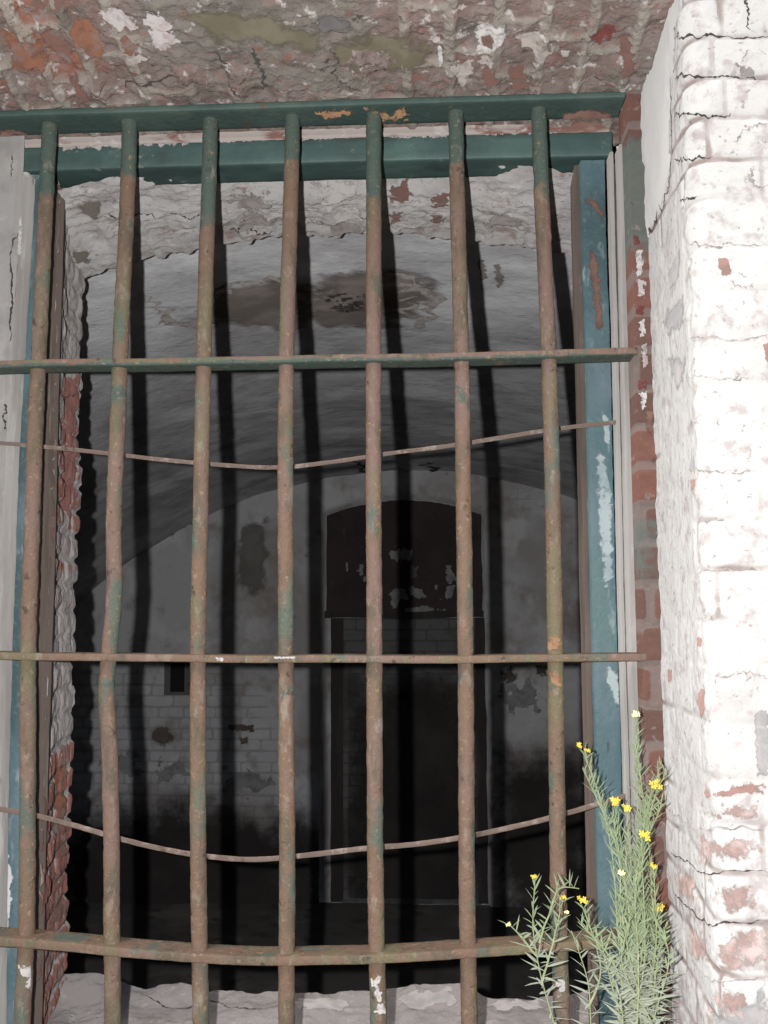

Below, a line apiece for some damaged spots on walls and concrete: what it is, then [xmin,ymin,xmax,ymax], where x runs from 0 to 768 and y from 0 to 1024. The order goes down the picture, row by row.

crack [675,0,766,40]
spalling [0,7,181,105]
peeling [409,23,570,95]
corrosion [315,107,410,125]
crack [648,72,768,235]
corrosion [73,251,90,264]
corrosion [589,251,603,329]
peeling [635,250,646,297]
damp [238,520,268,595]
corrosion [548,635,562,651]
peeling [704,784,765,819]
peeling [710,880,755,914]